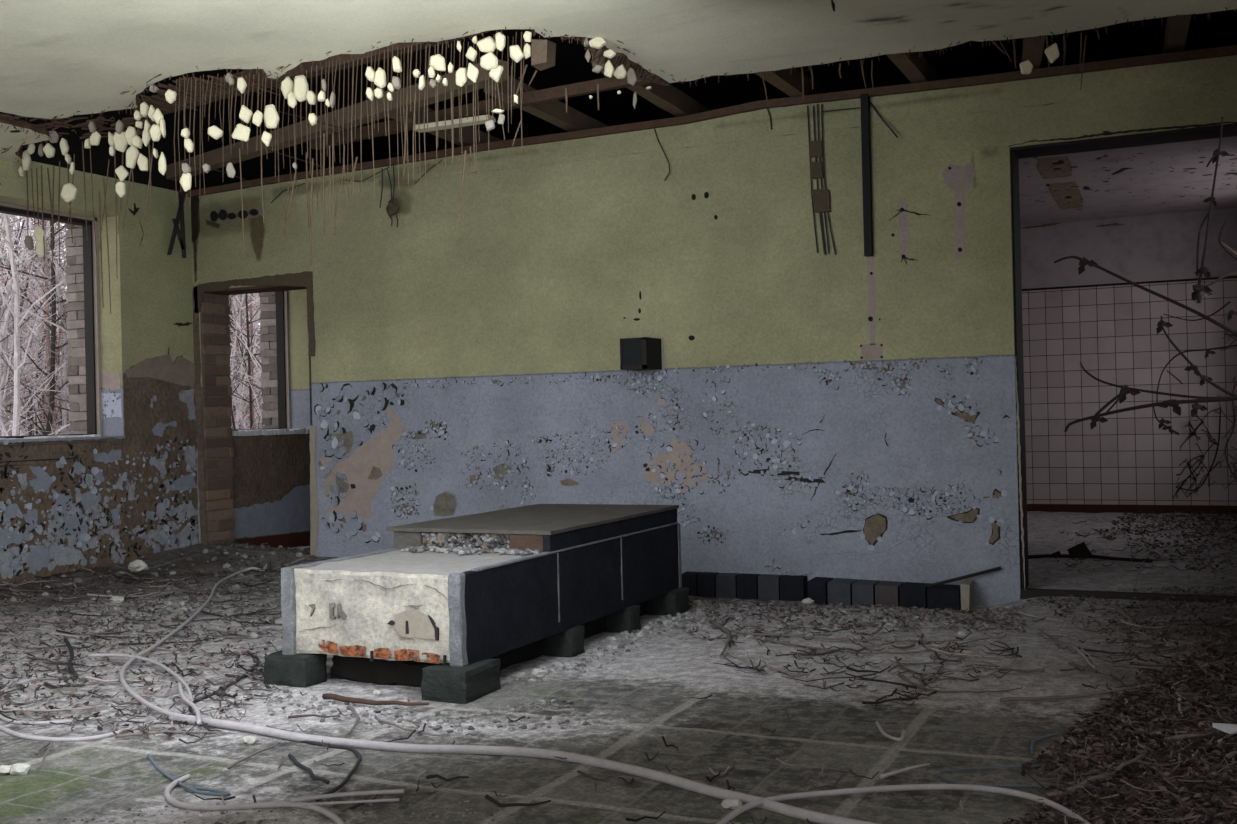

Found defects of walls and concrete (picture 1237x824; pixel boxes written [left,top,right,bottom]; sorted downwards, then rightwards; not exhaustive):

peeling [0,355,199,584]
flaking render [231,257,1007,555]